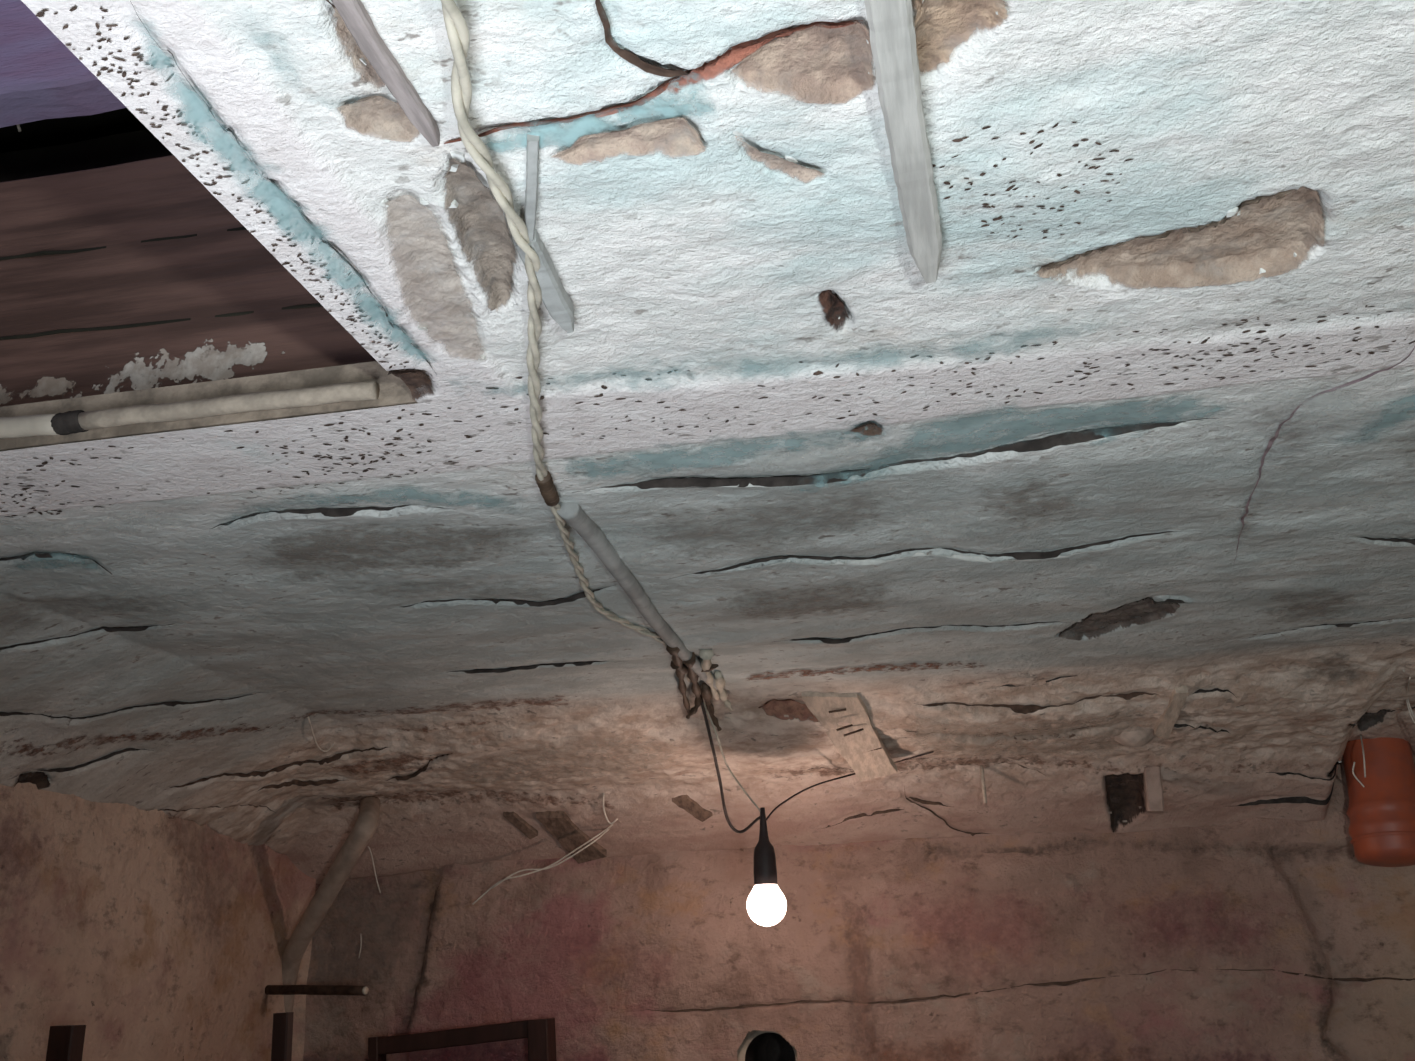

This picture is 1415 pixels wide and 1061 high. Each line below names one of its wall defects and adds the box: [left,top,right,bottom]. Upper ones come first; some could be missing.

crack [444,0,863,144]
spalling [488,20,876,165]
spalling [914,0,1010,73]
spalling [177,84,517,400]
spalling [1036,186,1325,289]
spalling [819,290,849,331]
crack [572,418,1224,495]
crack [670,531,1205,581]
crack [0,692,261,719]
crack [158,747,449,813]
spalling [1105,773,1145,832]
crack [625,969,1415,1012]